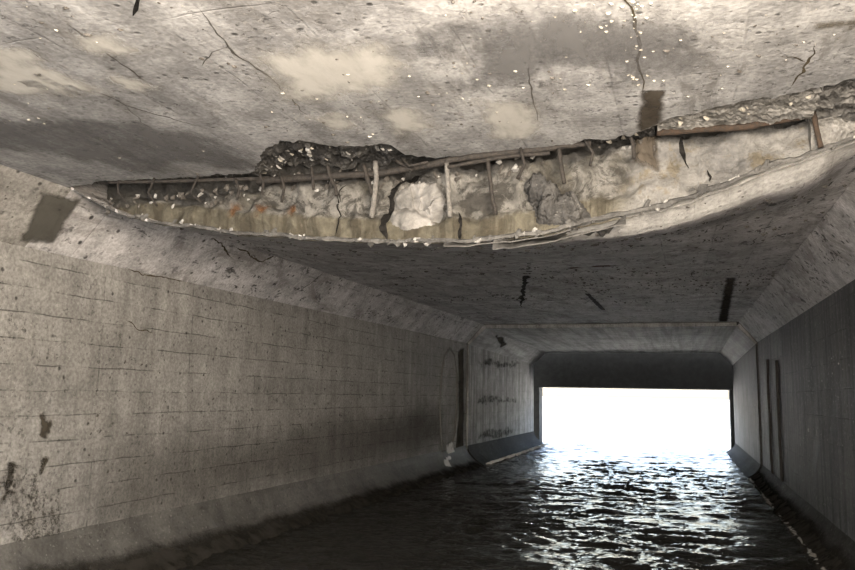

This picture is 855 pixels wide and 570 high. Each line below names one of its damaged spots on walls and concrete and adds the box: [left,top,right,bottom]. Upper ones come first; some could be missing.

crack [132,0,140,16]
crack [624,0,637,28]
crack [104,51,153,86]
crack [193,4,308,116]
crack [63,71,207,129]
spalling [570,78,855,158]
spalling [106,140,468,230]
spalling [495,158,521,178]
peeling [443,215,626,250]
damp [29,349,482,570]
damp [1,462,16,502]